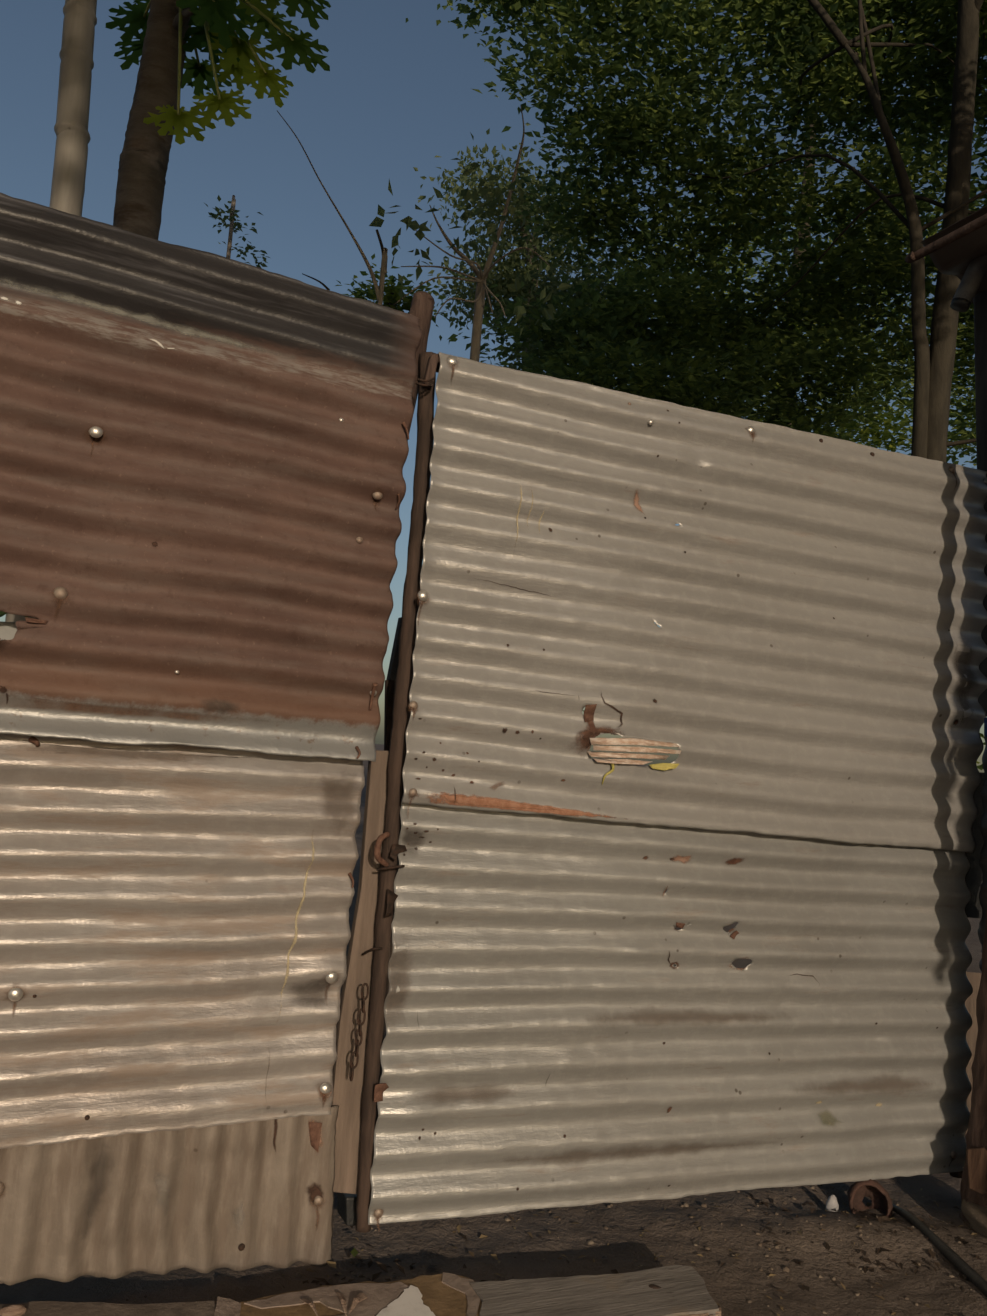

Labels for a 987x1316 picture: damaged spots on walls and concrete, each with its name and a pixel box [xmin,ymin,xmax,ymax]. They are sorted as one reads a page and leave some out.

corrosion [65,703,152,715]
peeling [583,704,597,722]
corrosion [414,742,611,818]
corrosion [390,801,439,861]